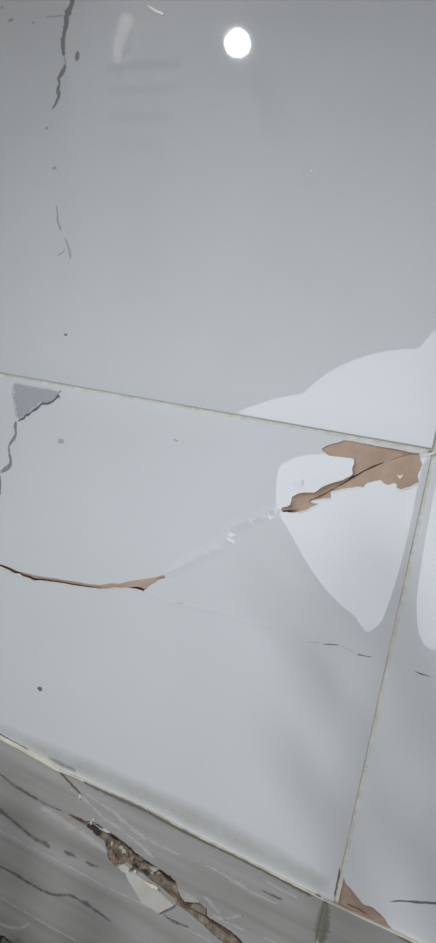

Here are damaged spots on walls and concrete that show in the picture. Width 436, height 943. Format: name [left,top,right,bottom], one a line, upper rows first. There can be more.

crack [0,422,17,493]
spalling [282,441,436,514]
crack [0,503,282,592]
spalling [315,869,392,929]